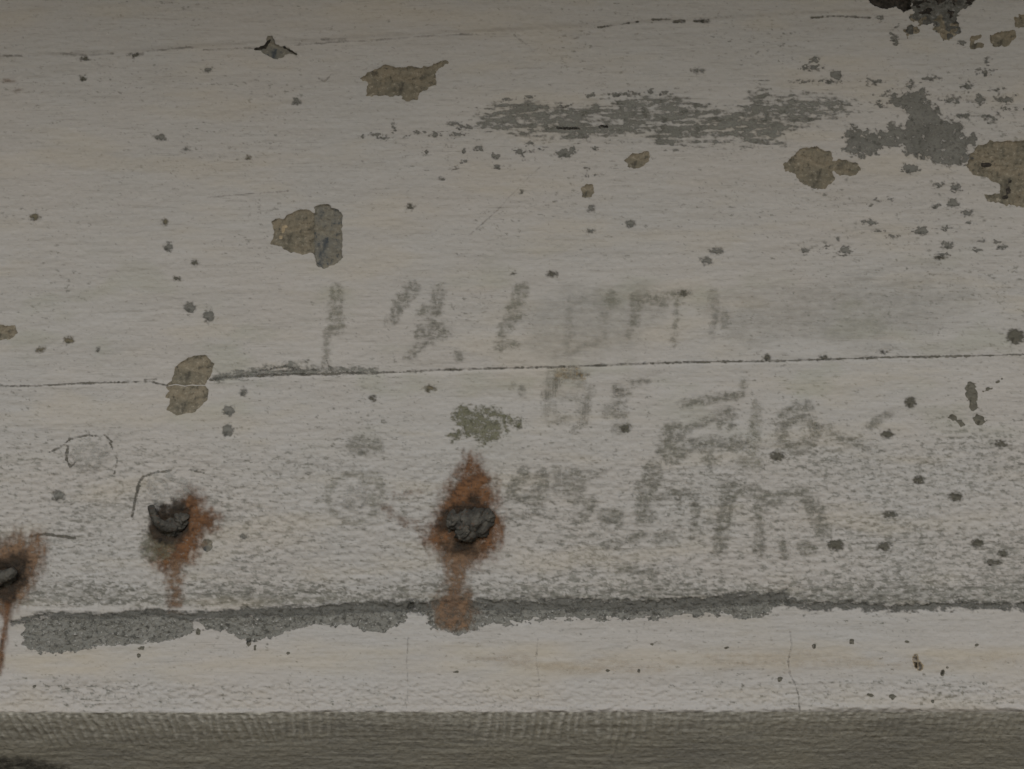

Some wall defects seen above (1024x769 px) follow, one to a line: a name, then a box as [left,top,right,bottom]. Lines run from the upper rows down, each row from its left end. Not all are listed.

spalling [869,0,1024,76]
peeling [360,57,852,169]
peeling [783,75,1024,208]
spalling [270,204,343,269]
crack [11,379,165,387]
spalling [166,355,378,415]
crack [209,360,622,381]
crack [651,354,1024,364]
rust [142,491,218,607]
rust [423,456,504,629]
rust [0,534,46,671]
peeling [21,599,781,658]